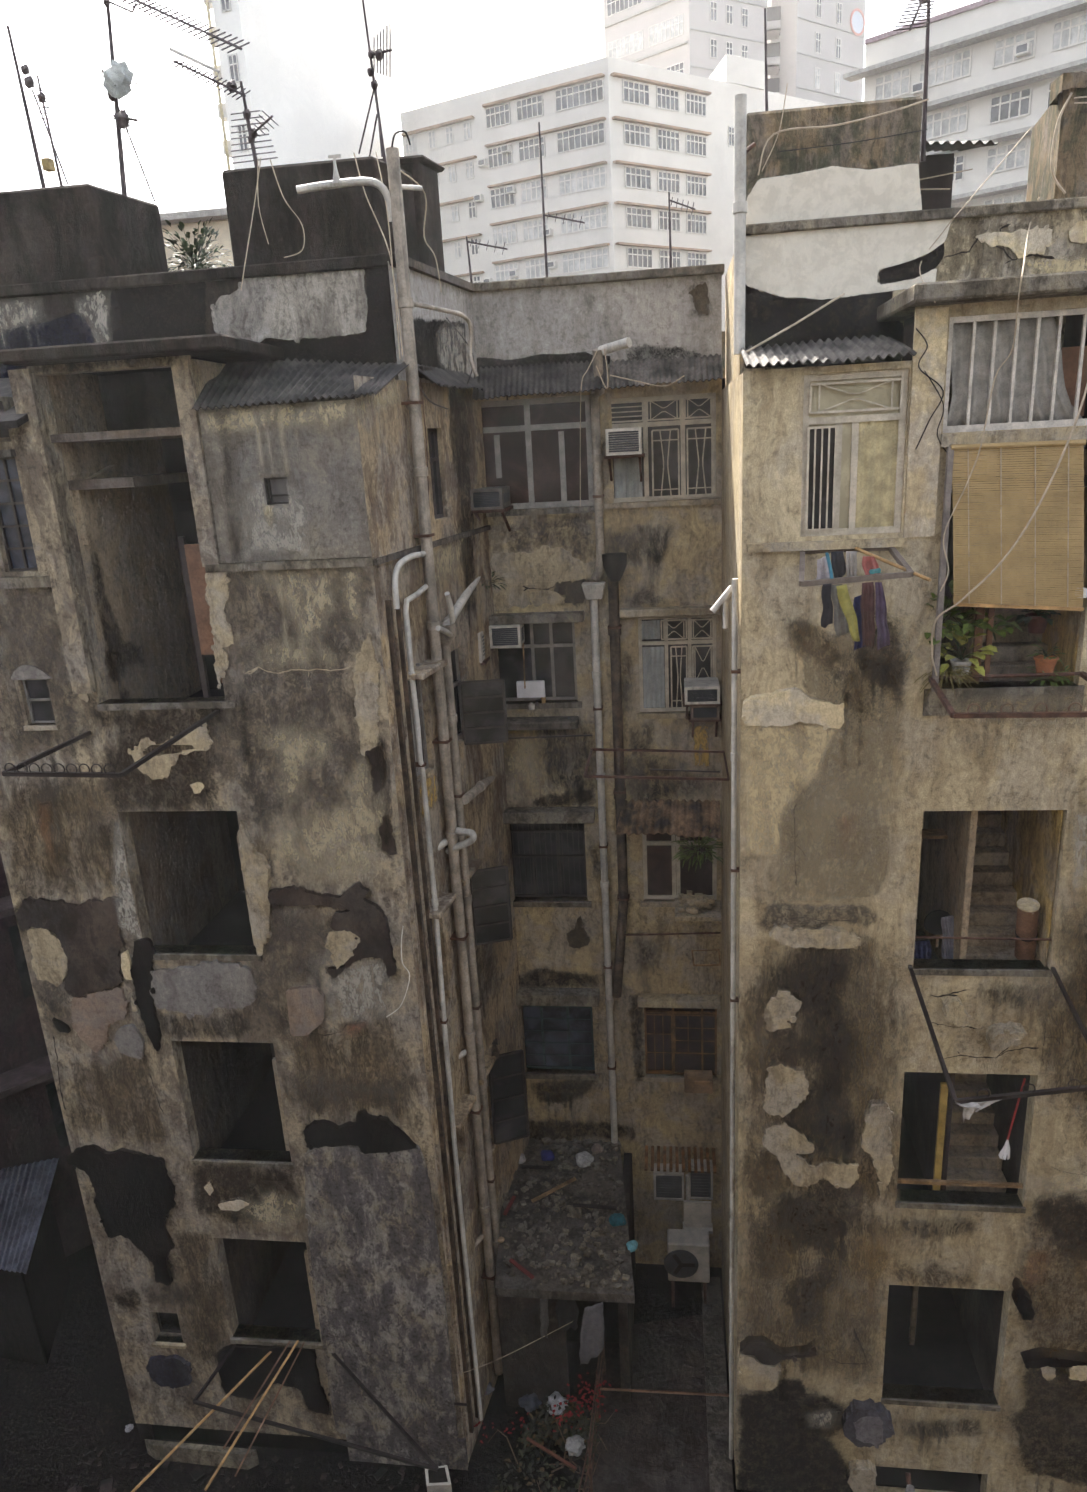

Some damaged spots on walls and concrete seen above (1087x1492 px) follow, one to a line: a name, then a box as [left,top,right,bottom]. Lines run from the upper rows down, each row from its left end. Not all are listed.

peeling [210,269,368,344]
peeling [976,221,1087,258]
peeling [127,722,213,780]
water stain [0,378,399,939]
water stain [746,619,906,854]
flaking render [14,896,162,1053]
flaking render [237,816,397,981]
water stain [981,908,1087,1144]
flaking render [302,1109,417,1154]
peeling [762,1060,895,1201]
flaking render [67,1144,176,1286]
water stain [1009,1171,1087,1492]